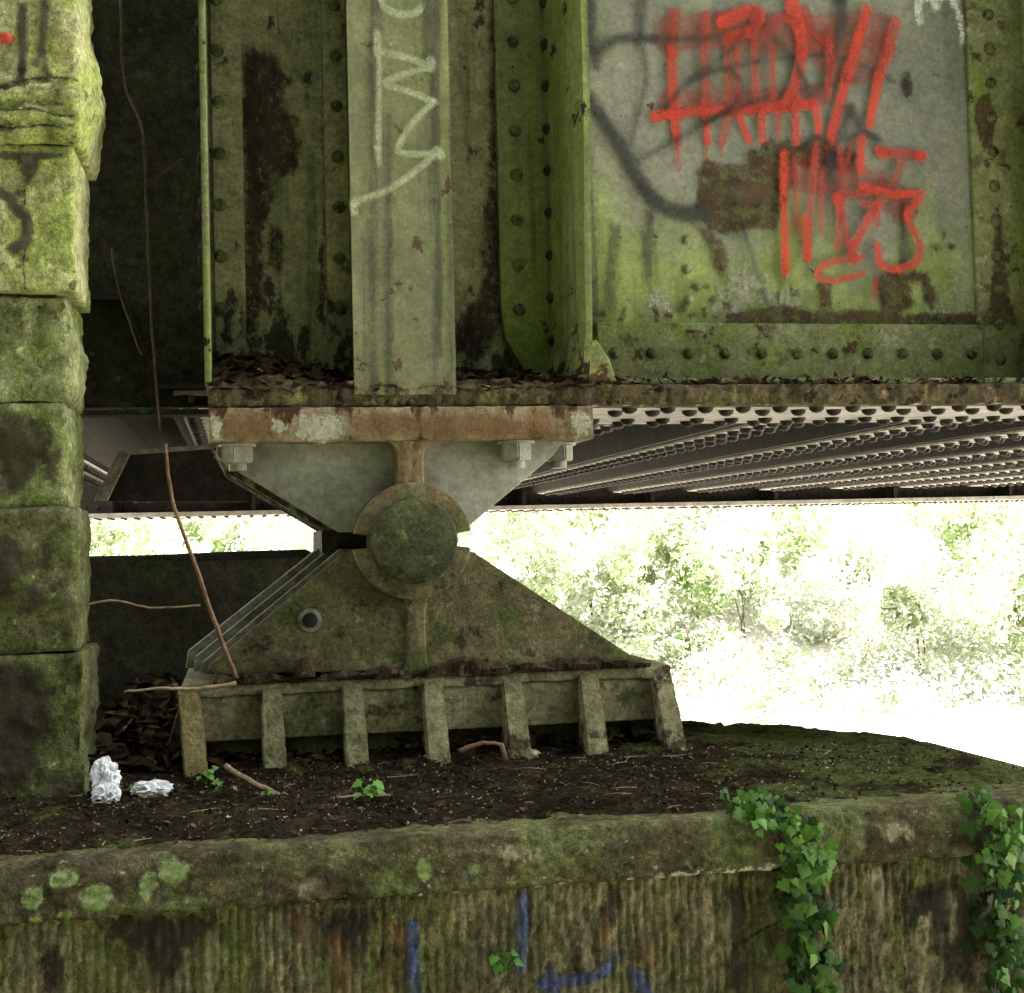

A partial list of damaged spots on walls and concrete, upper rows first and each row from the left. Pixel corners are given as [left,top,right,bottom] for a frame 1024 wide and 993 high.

rust [974,93,996,148]
rust [695,138,858,277]
peeling [210,415,223,440]
peeling [271,413,347,444]
peeling [570,412,592,437]